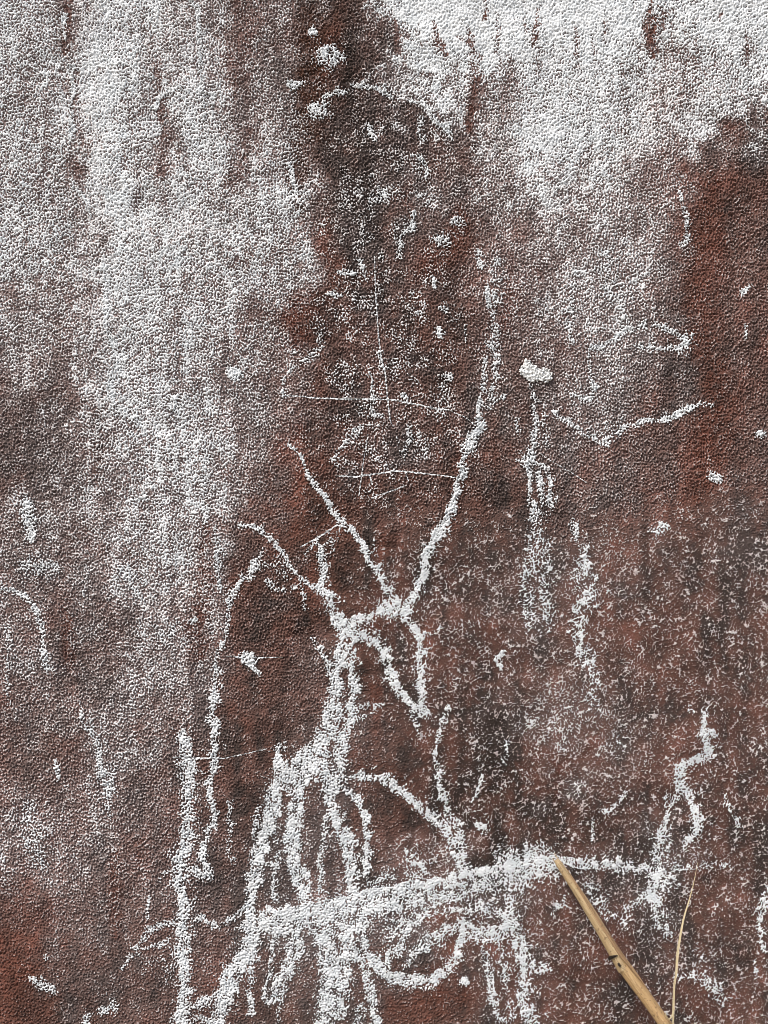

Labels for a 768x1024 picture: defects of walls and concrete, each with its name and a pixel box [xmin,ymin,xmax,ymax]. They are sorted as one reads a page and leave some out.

efflorescence [0,0,317,605]
efflorescence [319,0,768,261]
efflorescence [120,243,737,1024]